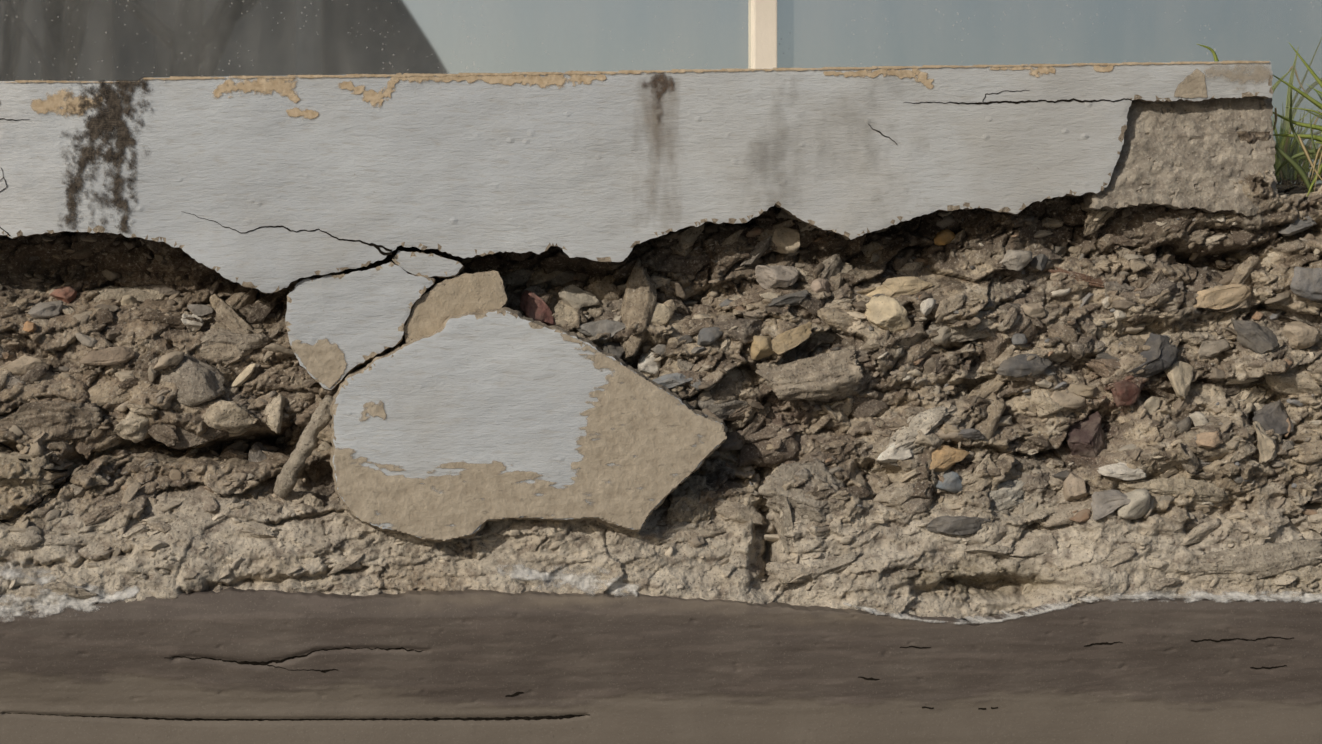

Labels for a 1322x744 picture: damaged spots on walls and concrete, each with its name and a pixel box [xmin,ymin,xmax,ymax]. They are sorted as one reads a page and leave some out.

peeling [6,80,118,116]
peeling [138,61,1270,119]
damp [60,81,135,229]
spalling [1237,131,1270,144]
crack [184,212,392,255]
spalling [0,170,1322,619]